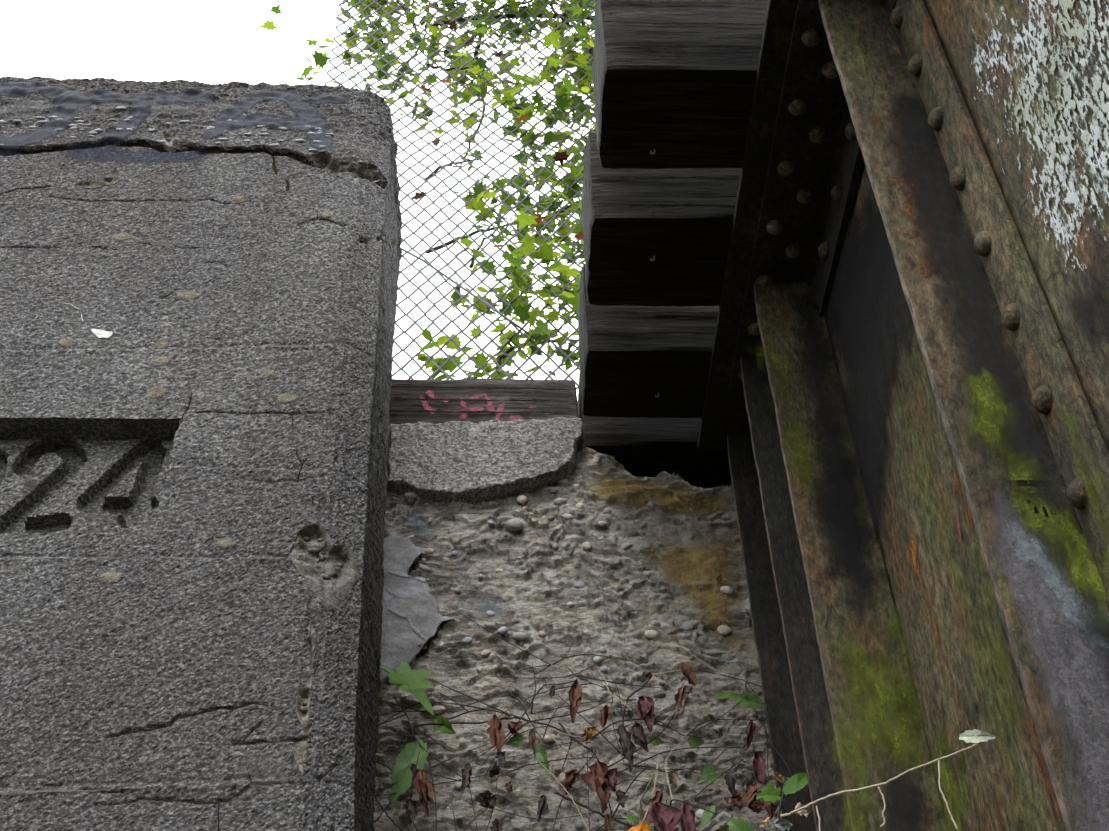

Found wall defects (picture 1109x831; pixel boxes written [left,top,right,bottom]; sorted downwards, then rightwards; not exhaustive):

peeling [0,116,103,138]
crack [1,186,239,204]
spalling [146,118,236,153]
crack [0,139,384,191]
spalling [243,125,384,183]
peeling [971,0,1109,273]
damp [791,198,915,605]
damp [893,95,1109,831]
spalling [289,523,356,588]
spalling [373,438,781,831]
crack [28,702,341,831]
damp [885,772,921,831]